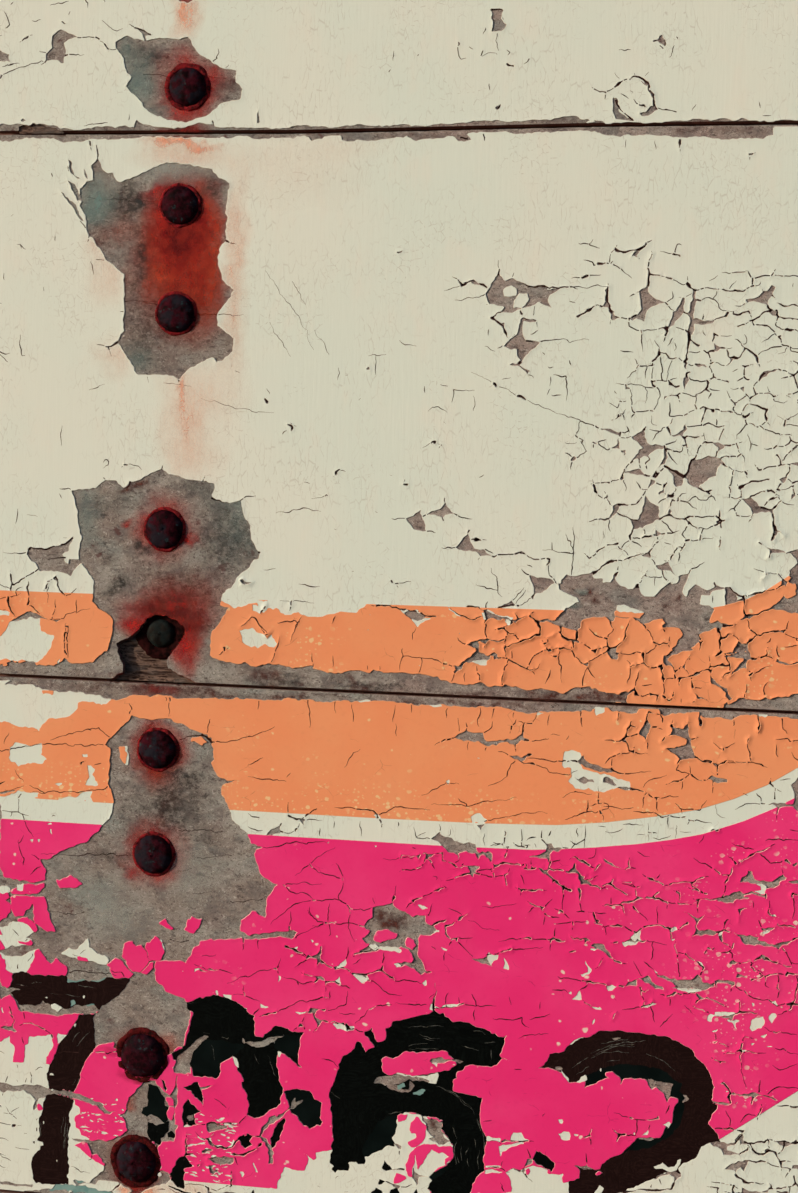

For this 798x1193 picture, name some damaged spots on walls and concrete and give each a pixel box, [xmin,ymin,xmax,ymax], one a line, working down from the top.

peeling [483,9,506,48]
rust [156,59,217,153]
peeling [0,20,798,379]
rust [145,183,222,336]
peeling [445,266,576,400]
crack [219,568,368,667]
crack [248,240,798,1193]
crack [0,797,114,875]
peeling [0,459,798,1193]
rust [116,1027,169,1083]
rust [110,1134,161,1193]
crack [175,1091,277,1193]